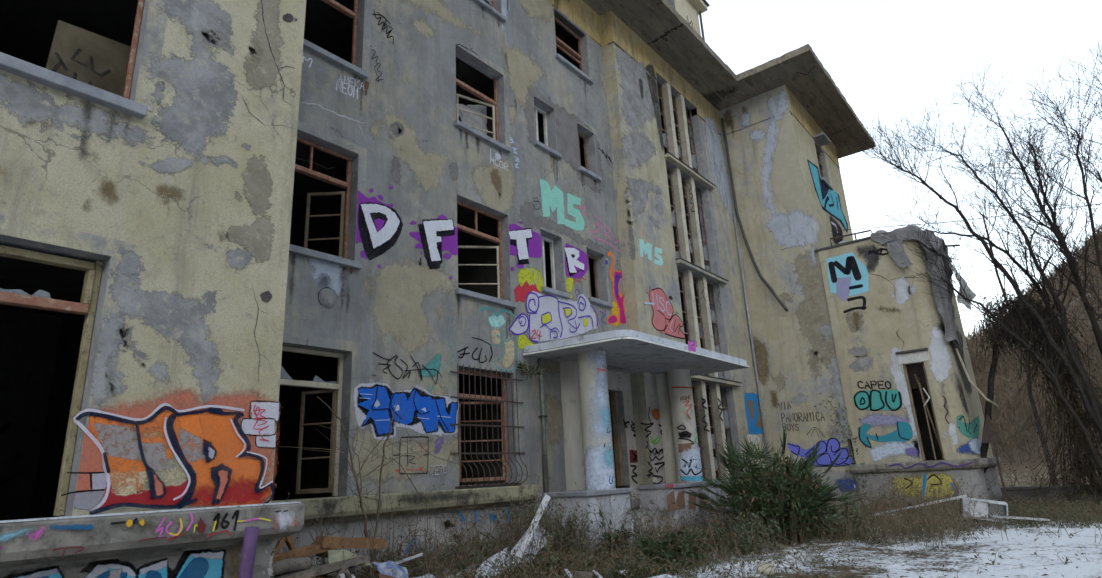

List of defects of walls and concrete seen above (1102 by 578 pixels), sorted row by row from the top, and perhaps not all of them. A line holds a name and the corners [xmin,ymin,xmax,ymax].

peeling [0,0,297,270]
crack [243,0,365,138]
peeling [90,246,223,407]